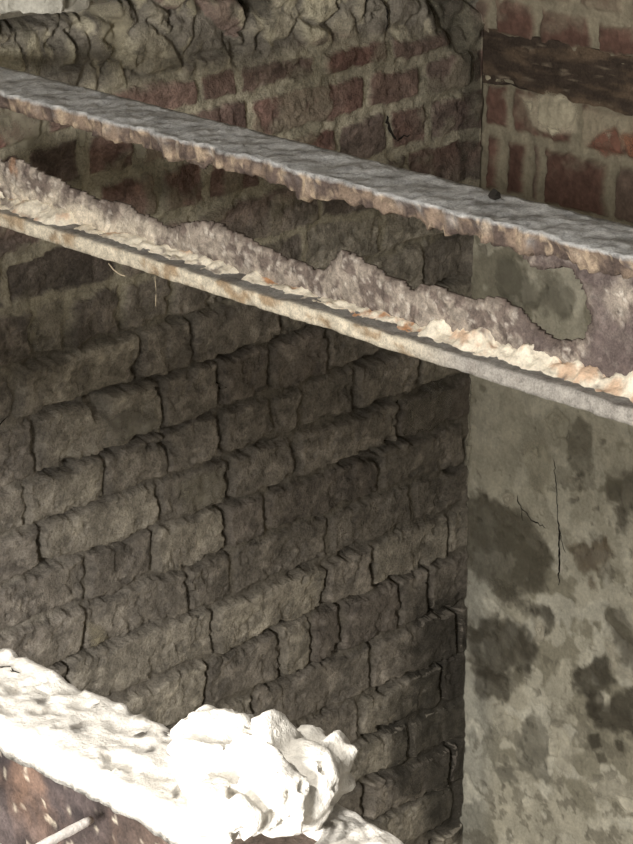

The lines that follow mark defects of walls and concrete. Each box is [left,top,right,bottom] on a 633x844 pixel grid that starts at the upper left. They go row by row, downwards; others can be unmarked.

spalling [591,128,633,157]
leakage [466,494,551,603]
crack [517,462,565,585]
leakage [531,606,554,634]
leakage [574,656,633,762]